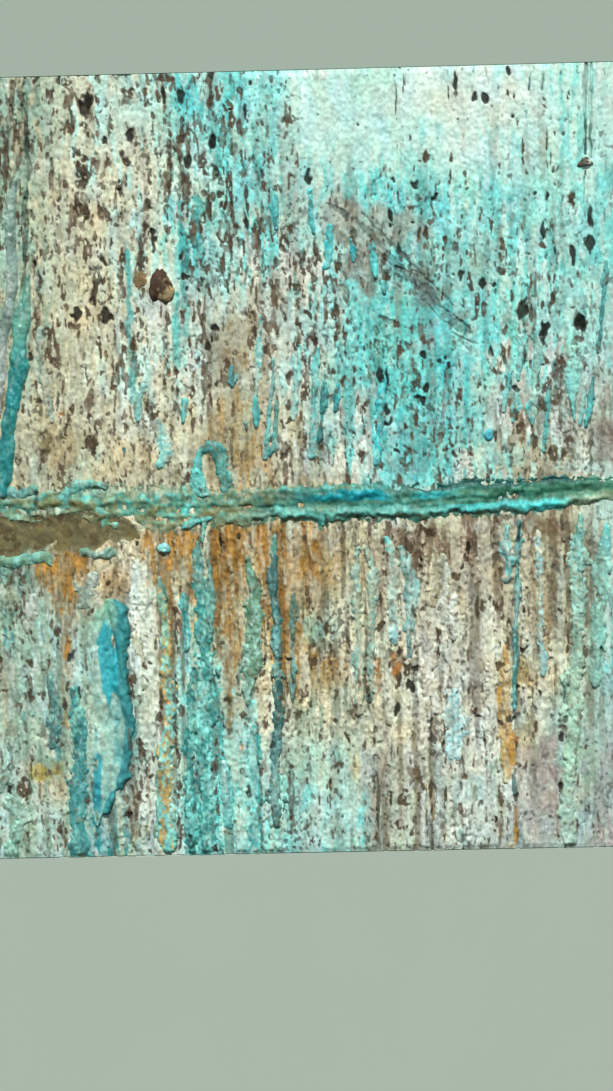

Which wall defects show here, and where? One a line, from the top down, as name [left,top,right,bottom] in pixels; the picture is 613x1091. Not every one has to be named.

corrosion [143,529,194,627]
corrosion [35,551,88,675]
corrosion [212,524,318,730]
corrosion [376,654,401,679]
peeling [5,720,18,737]
peeling [67,599,136,827]
peeling [212,676,260,735]
corrosion [497,685,516,775]
peeling [8,777,32,801]
peeling [41,809,68,840]
peeling [397,782,447,829]